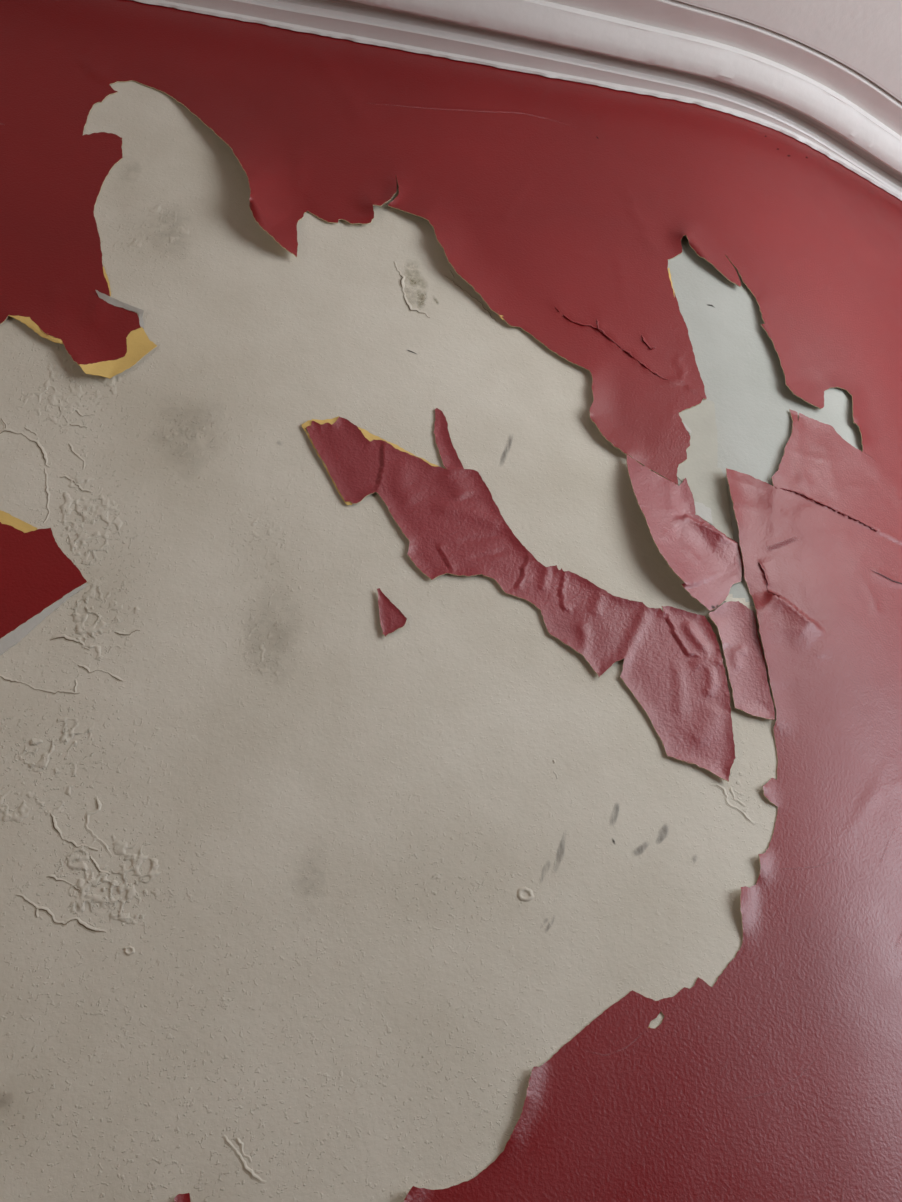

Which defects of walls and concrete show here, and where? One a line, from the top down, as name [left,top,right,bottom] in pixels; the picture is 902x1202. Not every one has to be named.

peeling [79,327,157,381]
crack [555,307,668,380]
peeling [667,236,862,545]
crack [0,400,95,523]
spalling [59,491,123,567]
crack [775,487,877,532]
peeling [0,583,88,655]
crack [0,628,140,695]
spalling [71,578,123,641]
peeling [302,408,743,782]
peeling [709,594,775,720]
crack [16,796,112,933]